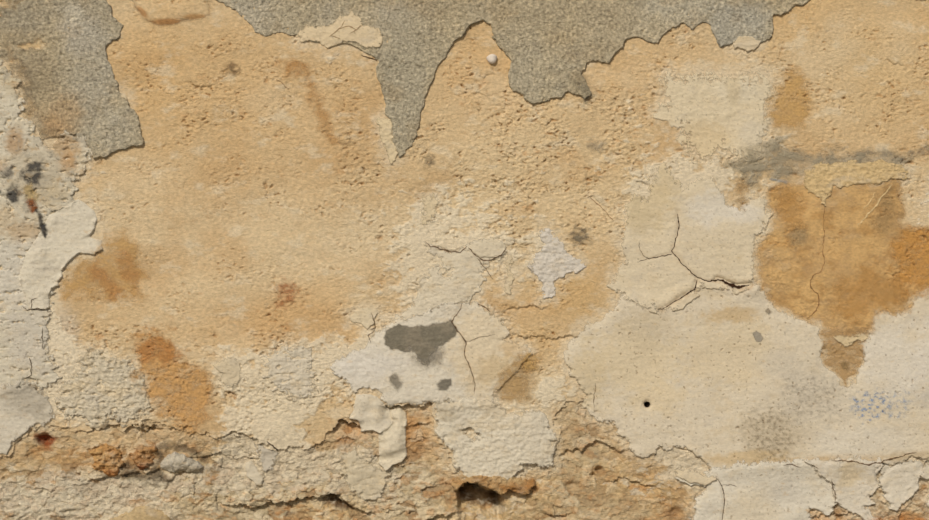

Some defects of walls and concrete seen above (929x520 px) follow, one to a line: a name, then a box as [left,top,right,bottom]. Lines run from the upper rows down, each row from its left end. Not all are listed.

peeling [216,0,809,164]
peeling [0,0,460,520]
crack [451,302,495,390]
peeling [330,159,929,520]
crack [639,214,749,310]
crack [807,207,825,319]